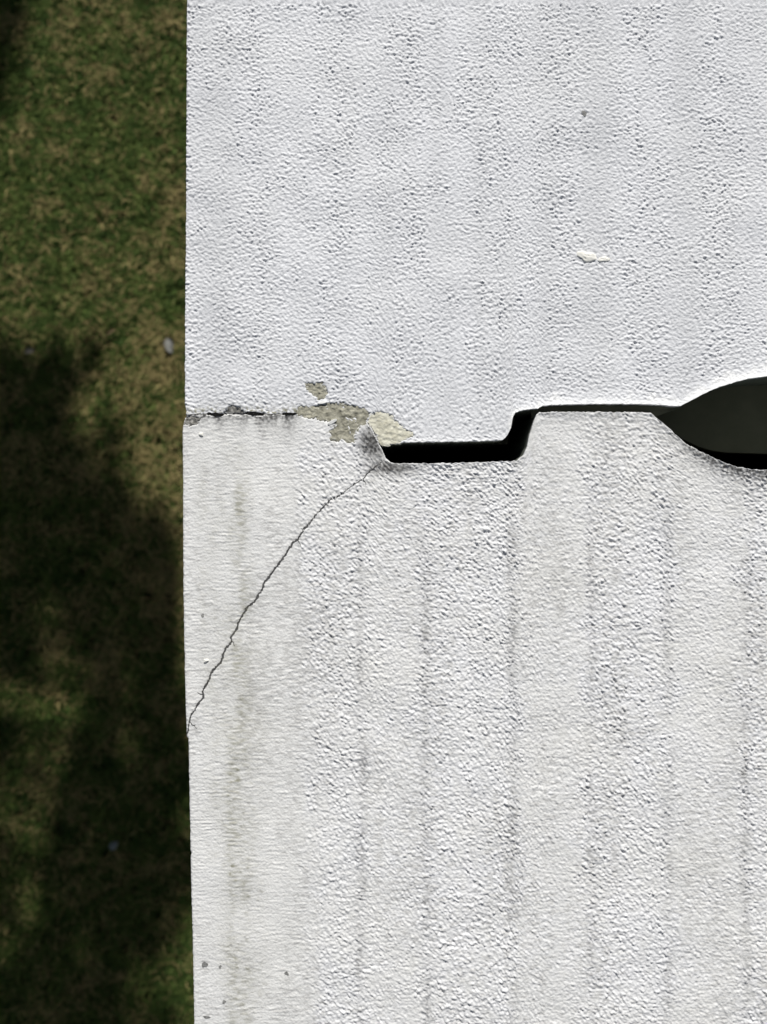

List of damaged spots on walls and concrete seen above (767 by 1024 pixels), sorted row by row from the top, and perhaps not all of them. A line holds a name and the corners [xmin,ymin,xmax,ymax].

spalling [296,382,413,447]
crack [186,462,381,736]